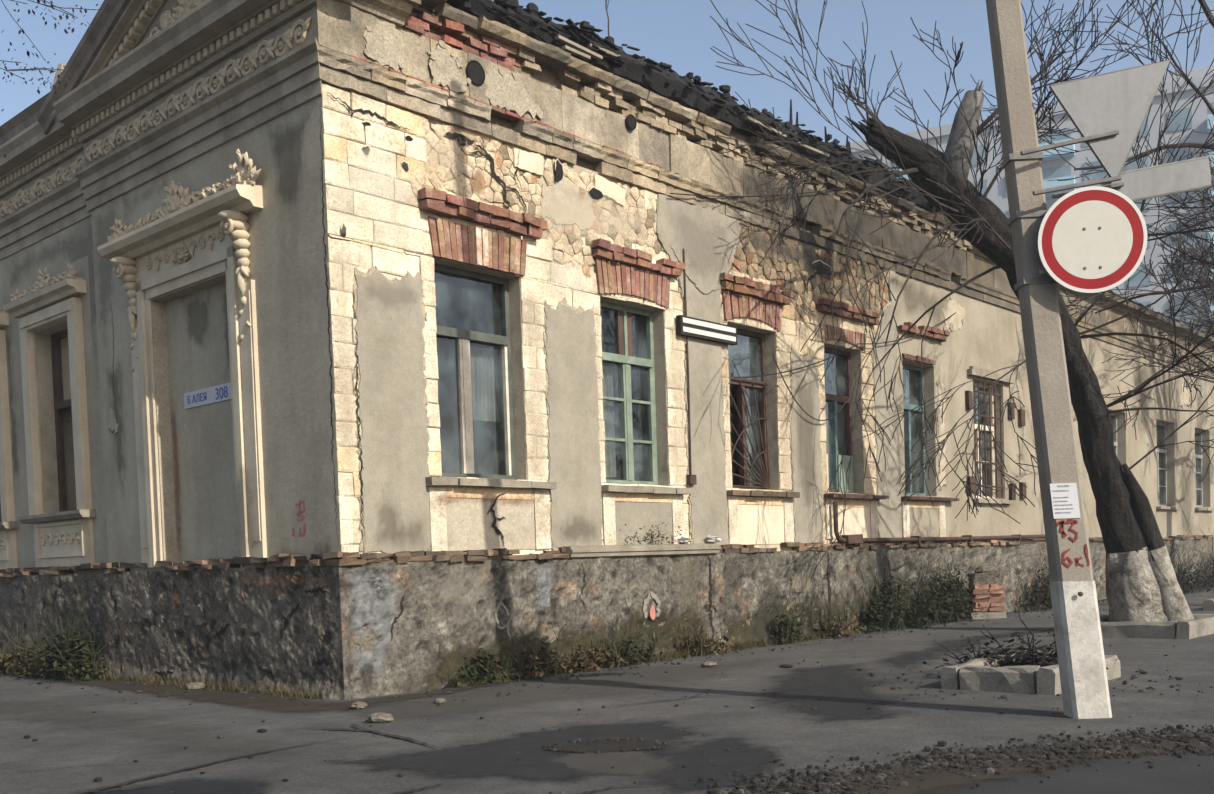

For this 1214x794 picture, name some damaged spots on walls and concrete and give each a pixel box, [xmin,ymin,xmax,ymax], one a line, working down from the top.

crack [446,132,527,212]
spalling [401,118,669,277]
spalling [730,219,890,324]
crack [487,493,506,548]